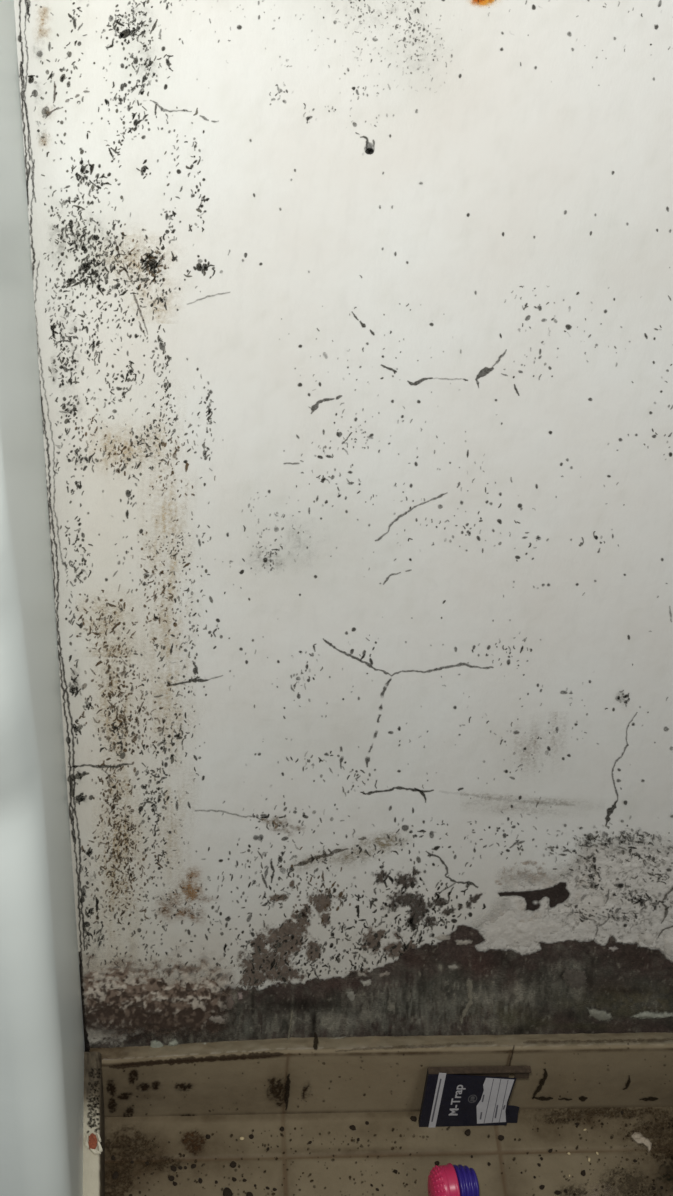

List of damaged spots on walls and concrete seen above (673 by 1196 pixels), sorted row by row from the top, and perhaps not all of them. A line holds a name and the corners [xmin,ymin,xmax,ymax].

crack [382,365,432,385]
crack [463,349,519,396]
water stain [28,0,671,989]
crack [375,482,460,541]
crack [323,639,493,803]
crack [605,717,634,825]
peeling [84,840,673,1052]